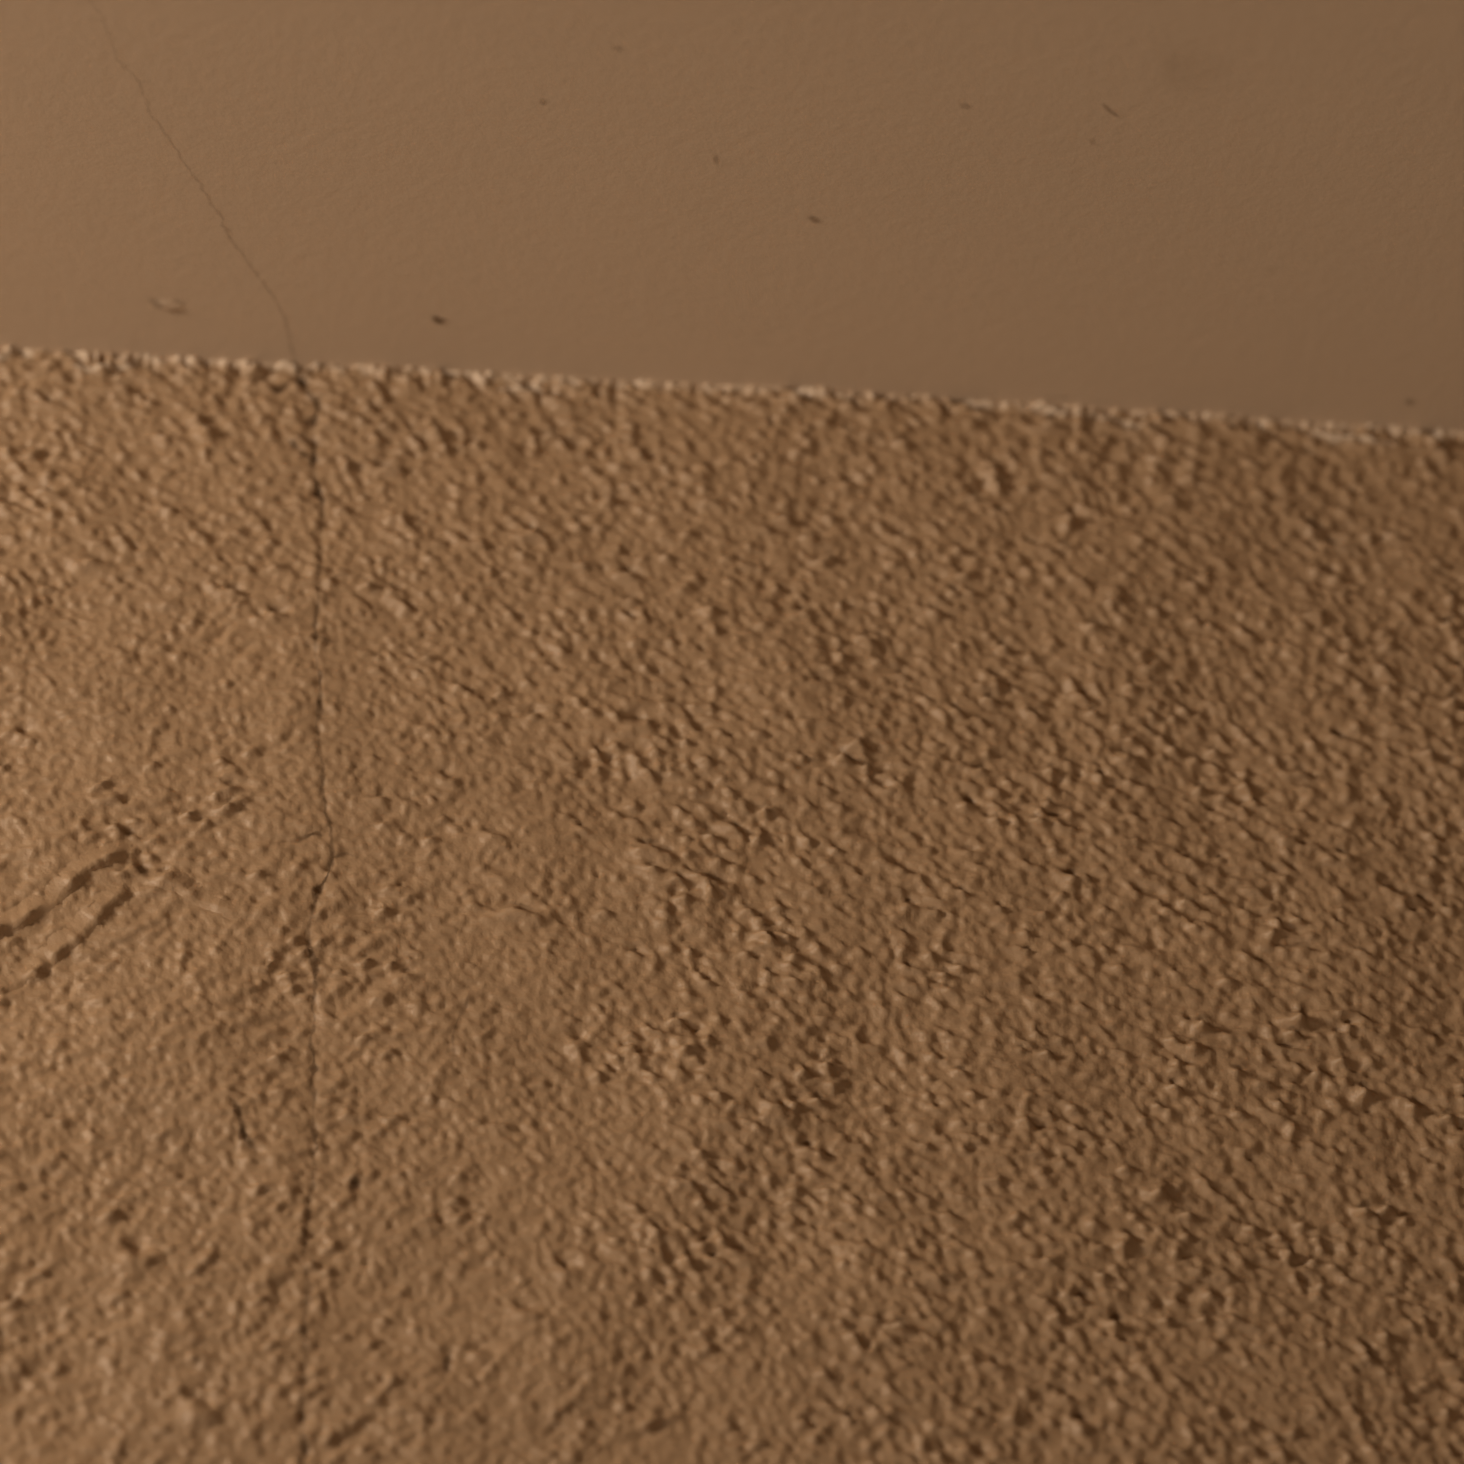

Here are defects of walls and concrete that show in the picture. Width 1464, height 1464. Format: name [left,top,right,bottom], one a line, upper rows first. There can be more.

crack [276,373,324,502]